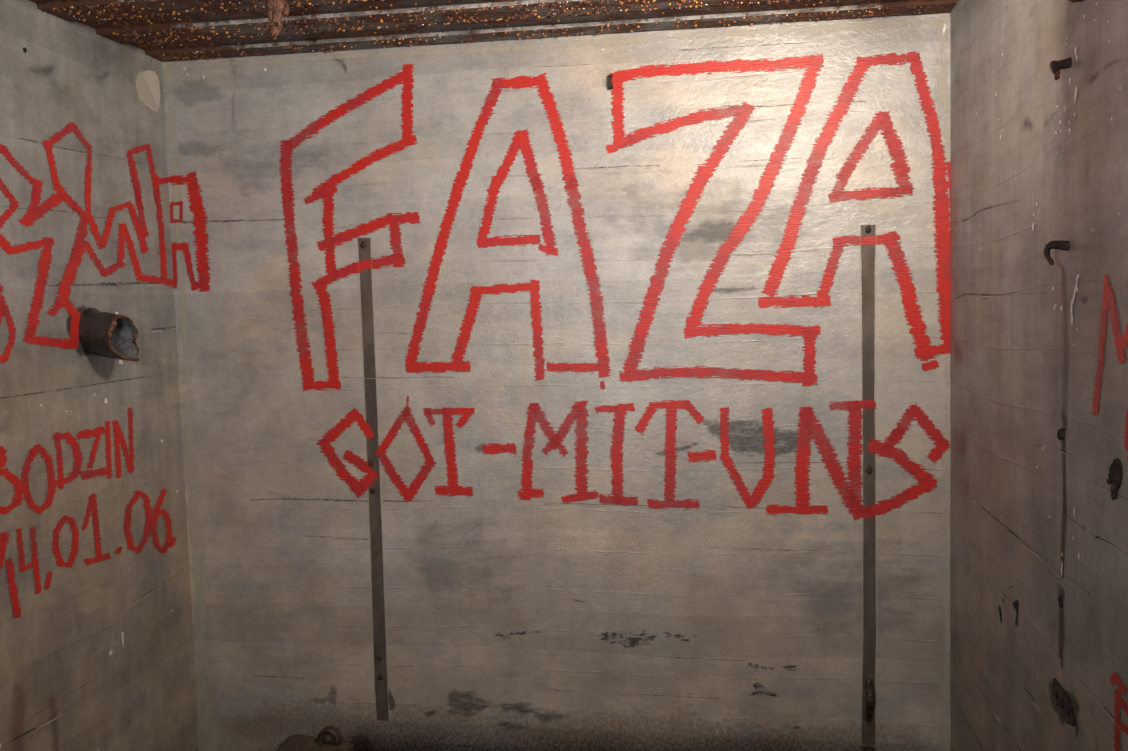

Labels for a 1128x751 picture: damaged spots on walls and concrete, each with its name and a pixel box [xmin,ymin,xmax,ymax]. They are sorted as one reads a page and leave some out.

rust [1057,435,1066,579]
spalling [1050,677,1079,734]
damp [343,730,857,751]